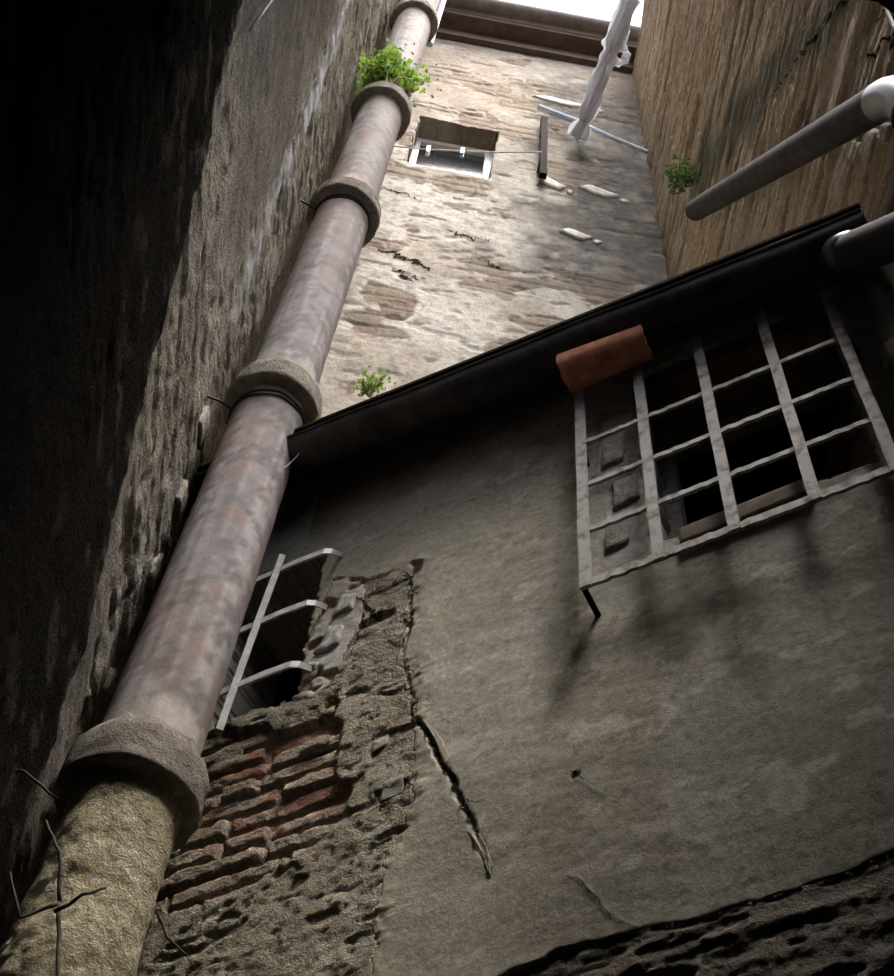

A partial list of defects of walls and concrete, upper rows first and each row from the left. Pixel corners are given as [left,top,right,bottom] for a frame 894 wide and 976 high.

peeling [197,405,210,450]
peeling [174,479,188,523]
peeling [147,553,164,596]
peeling [101,667,119,707]
crack [337,572,494,876]
spalling [137,572,417,976]